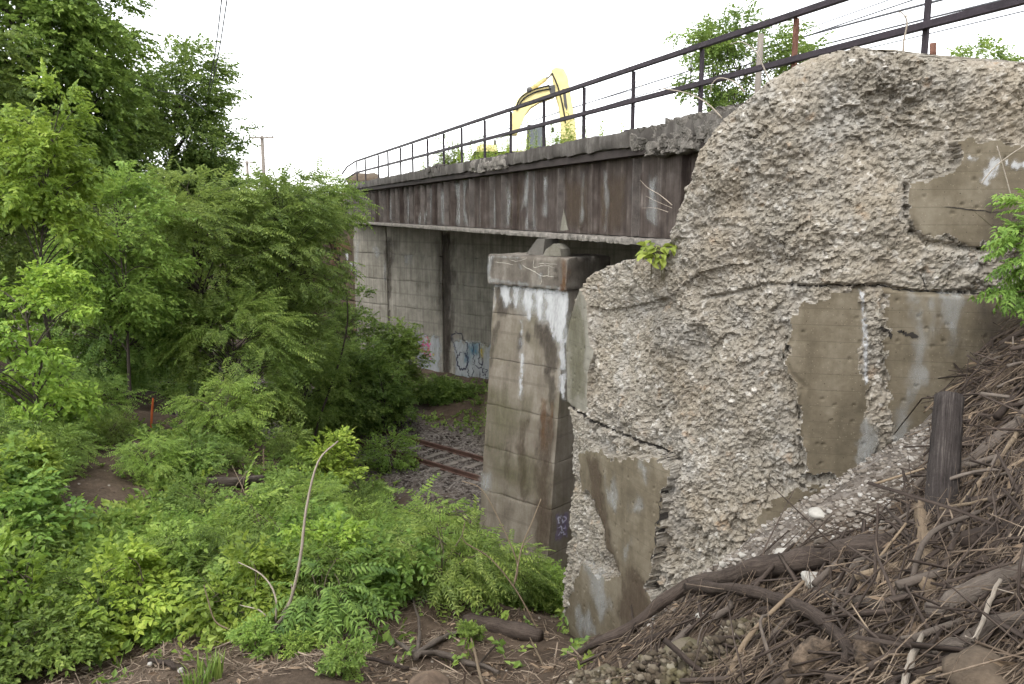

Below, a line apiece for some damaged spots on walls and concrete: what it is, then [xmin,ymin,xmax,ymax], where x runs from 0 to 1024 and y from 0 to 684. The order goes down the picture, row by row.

corrosion [601,177,624,229]
crack [782,276,1000,294]
damp [493,285,568,399]
spalling [562,46,1024,616]
crack [564,400,682,460]